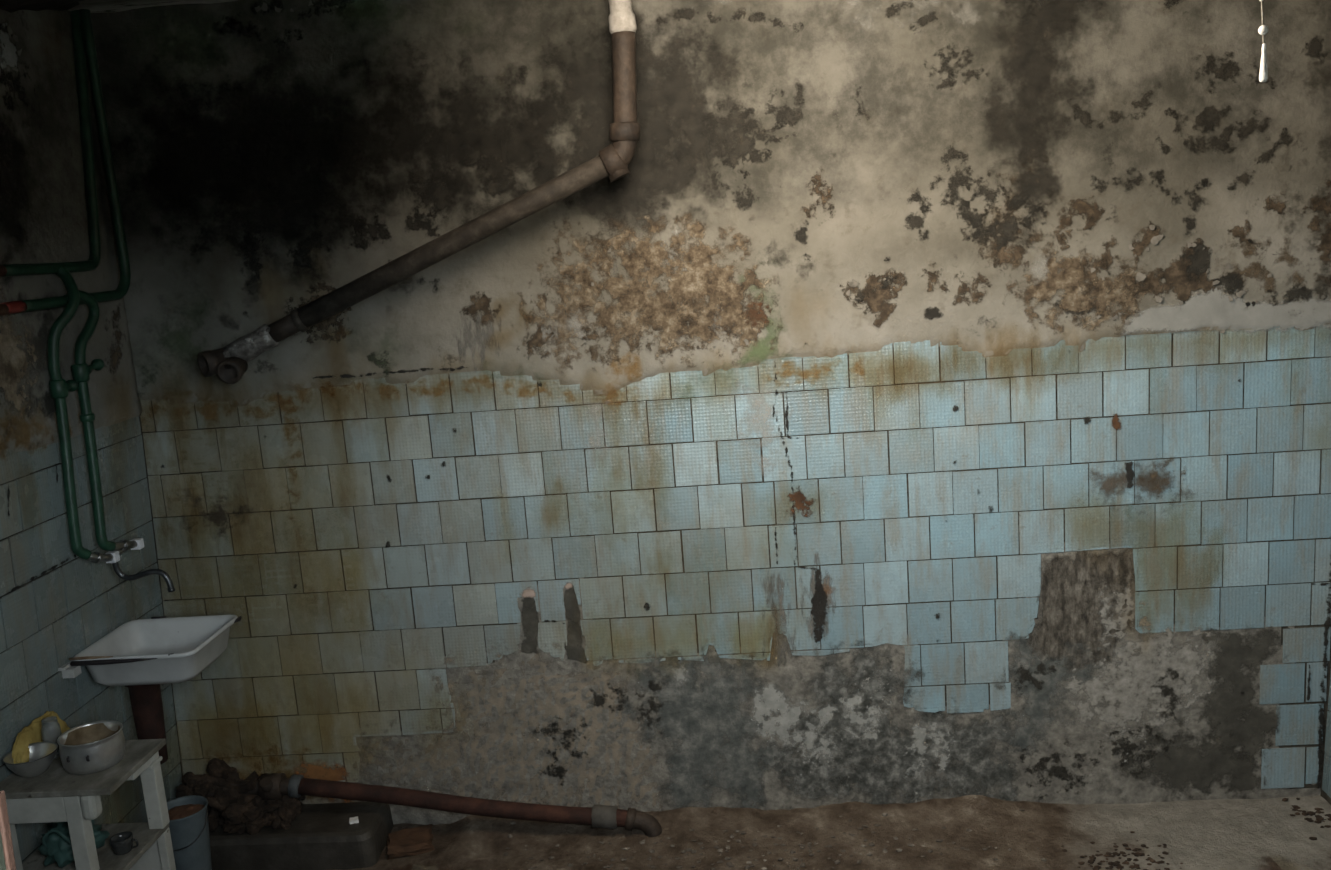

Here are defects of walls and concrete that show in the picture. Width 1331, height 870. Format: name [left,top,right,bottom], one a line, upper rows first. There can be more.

water stain [126,28,613,294]
water stain [314,291,501,378]
flaking render [519,215,783,368]
water stain [563,14,805,232]
water stain [795,169,834,267]
peeling [840,271,907,327]
mould [905,0,1292,319]
flaking render [1007,196,1331,335]
rust [788,490,814,517]
crack [773,365,834,643]
spalling [345,542,1321,812]
spalling [389,804,469,825]